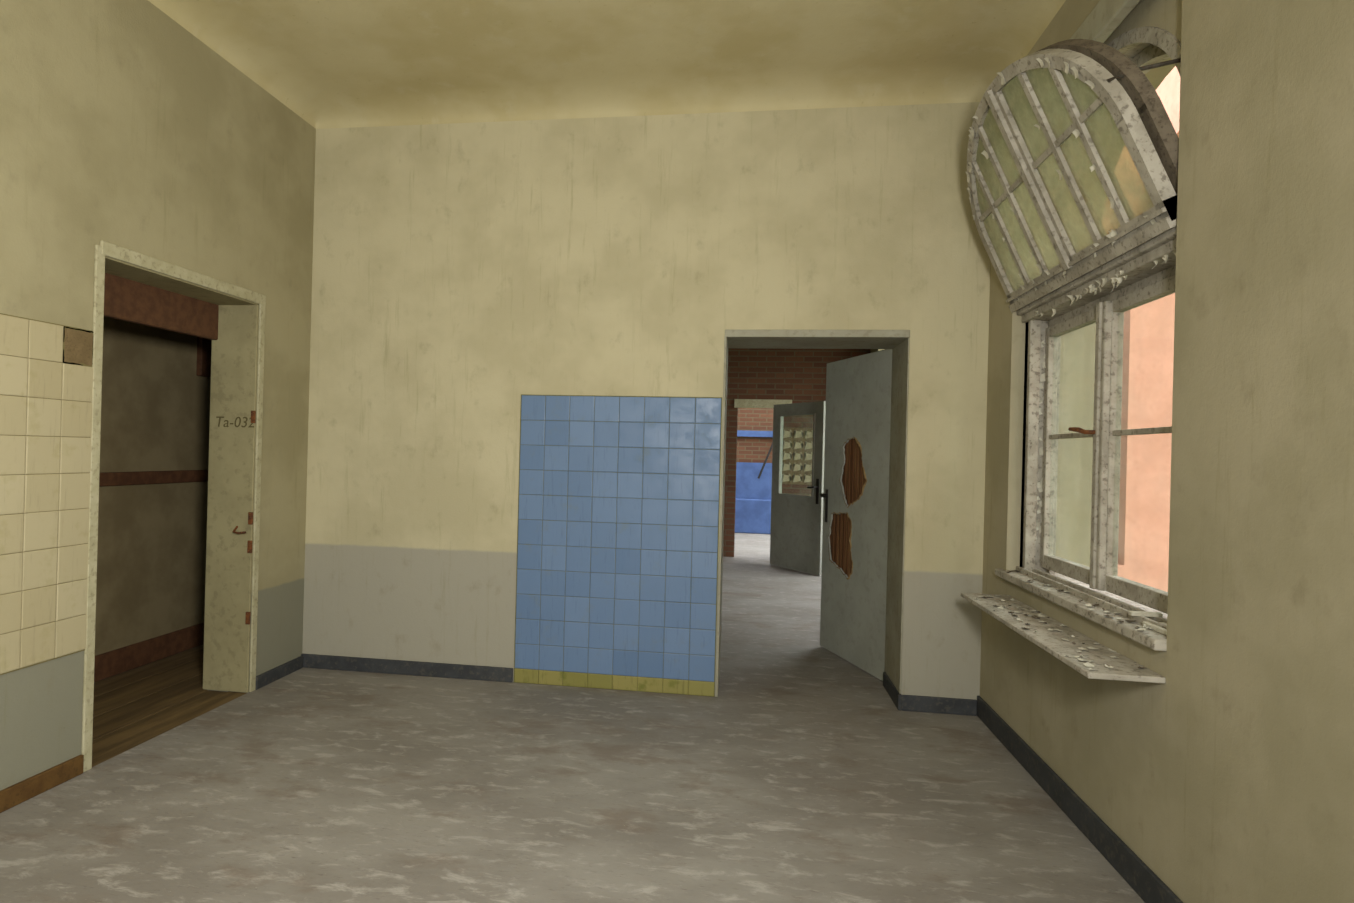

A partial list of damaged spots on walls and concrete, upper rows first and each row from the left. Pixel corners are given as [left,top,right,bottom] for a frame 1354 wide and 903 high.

peeling [63,326,94,366]